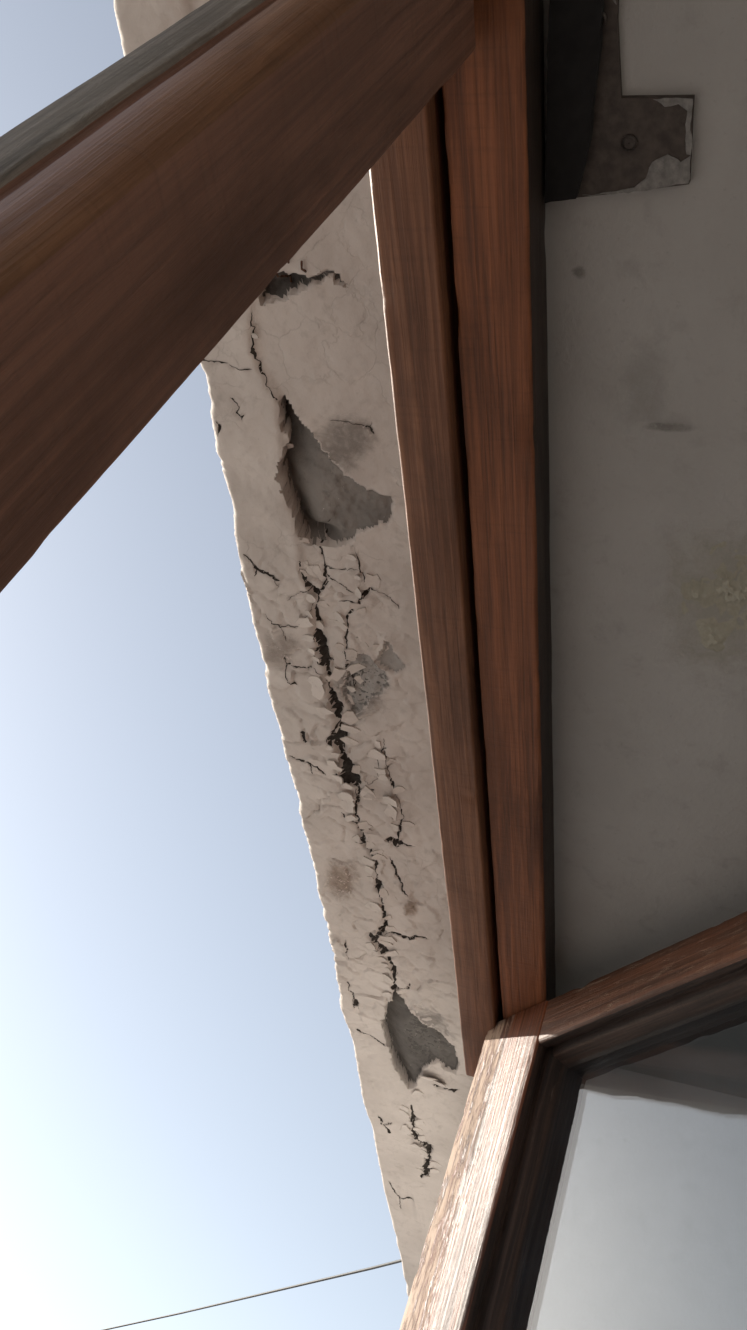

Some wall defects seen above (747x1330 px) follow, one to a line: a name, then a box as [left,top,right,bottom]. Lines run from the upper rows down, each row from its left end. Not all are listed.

spalling [262,261,342,298]
crack [203,313,278,437]
spalling [281,399,392,545]
crack [243,520,427,1045]
spalling [382,989,458,1096]
crack [378,1084,457,1208]